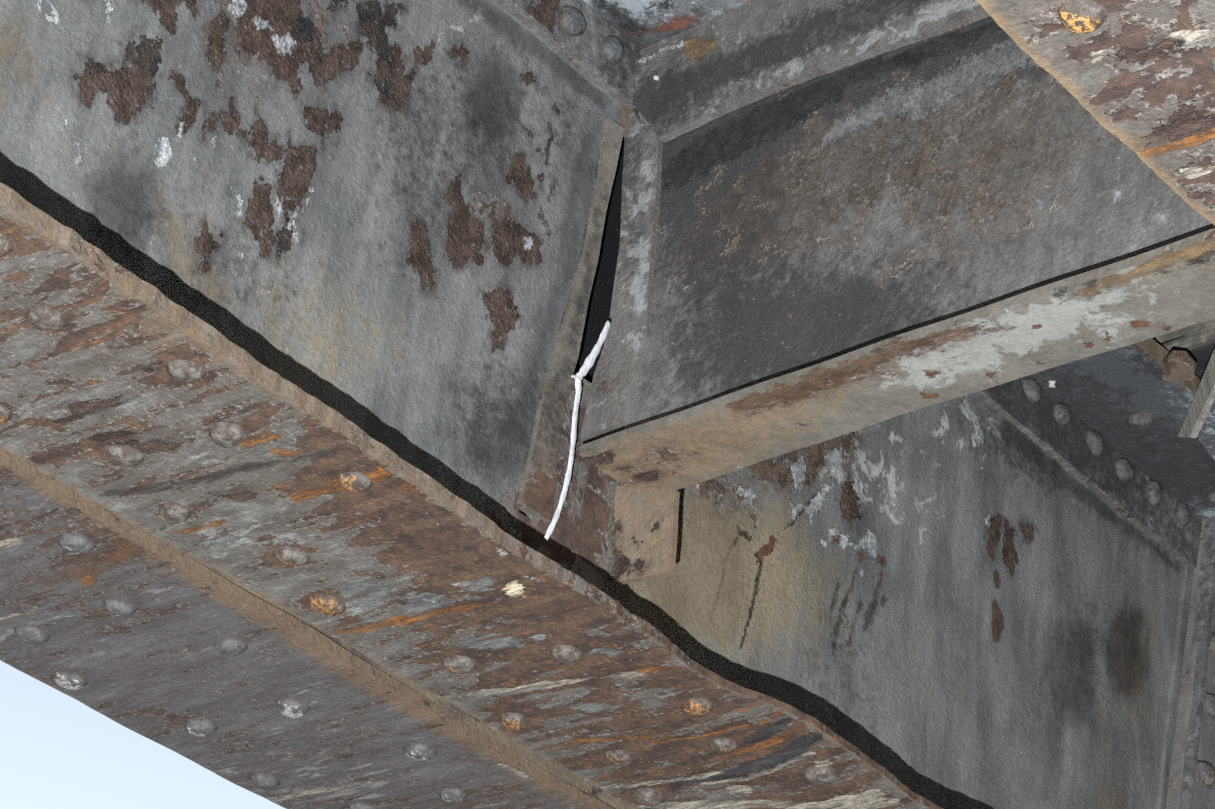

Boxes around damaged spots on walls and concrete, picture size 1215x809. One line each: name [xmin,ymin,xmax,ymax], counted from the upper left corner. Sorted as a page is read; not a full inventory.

rust [524,0,560,34]
rust [1140,128,1215,158]
rust [1078,238,1215,296]
rust [1129,320,1171,331]
rust [754,536,778,563]
rust [992,553,1015,642]